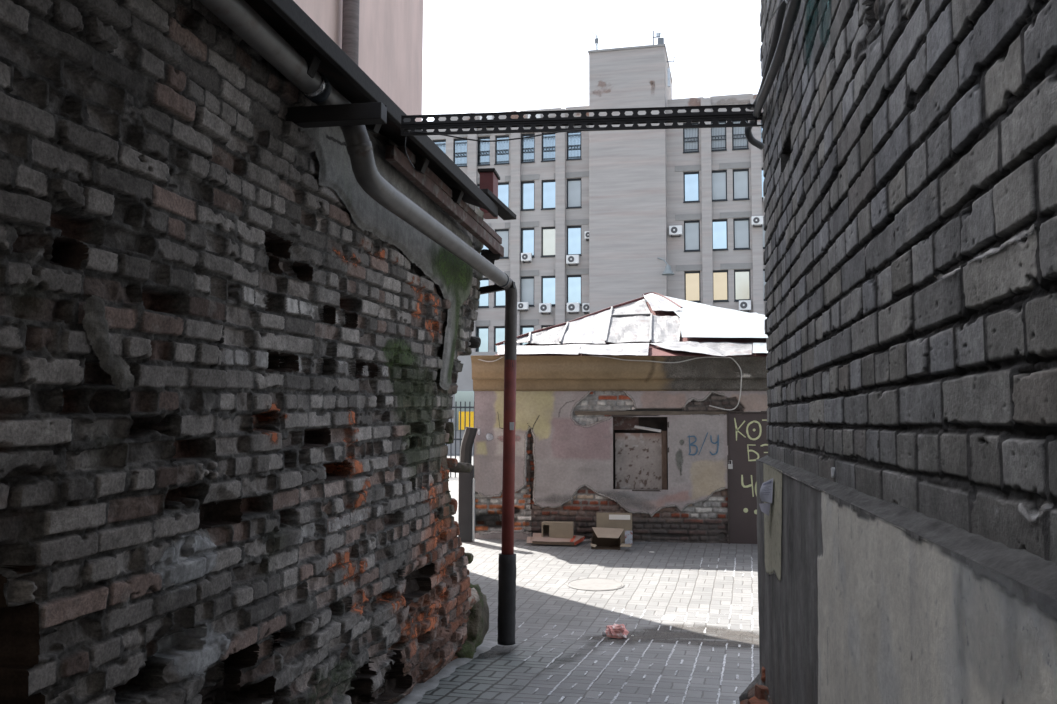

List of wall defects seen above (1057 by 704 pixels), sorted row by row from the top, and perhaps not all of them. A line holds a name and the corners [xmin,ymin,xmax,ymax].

spalling [444,422,454,444]
spalling [571,391,637,428]
spalling [302,411,371,509]
spalling [422,458,473,505]
spalling [198,499,243,530]
spalling [475,485,728,543]
spalling [327,551,474,704]